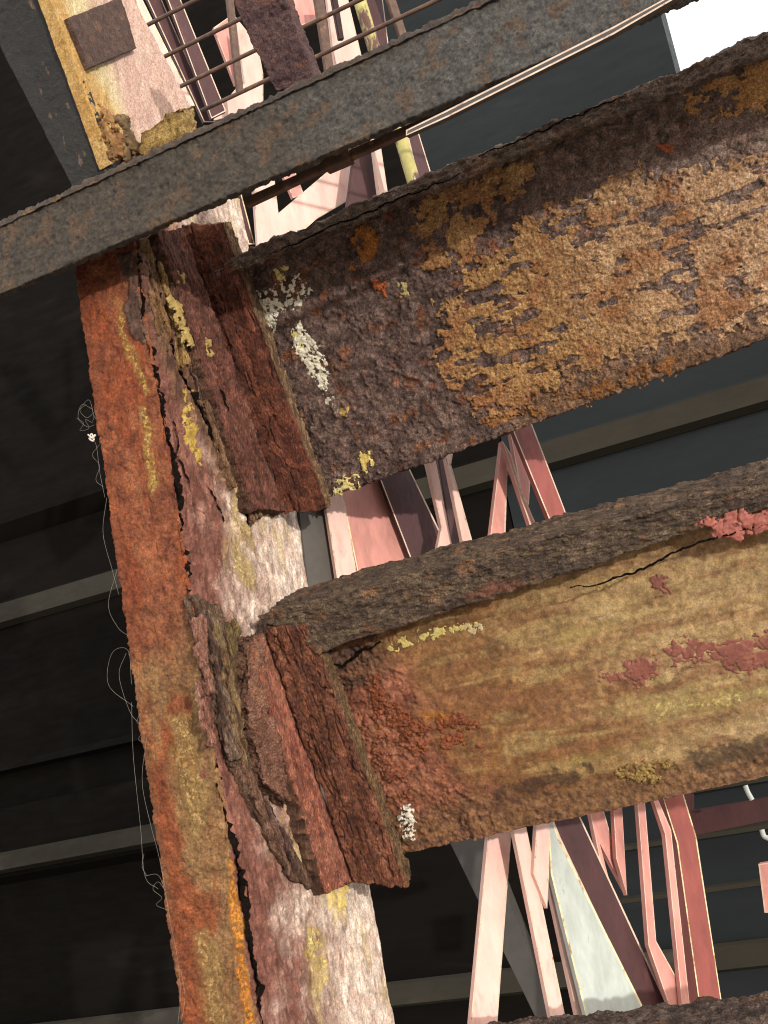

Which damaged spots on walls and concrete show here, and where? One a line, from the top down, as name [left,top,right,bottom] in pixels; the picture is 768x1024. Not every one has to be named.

rust [682,60,768,123]
rust [119,304,158,494]
rust [135,239,238,491]
crack [137,252,252,611]
rust [348,224,388,297]
rust [407,146,768,429]
crack [570,524,767,588]
crack [333,641,381,668]
rust [168,593,313,890]
rust [355,668,485,807]
rust [615,758,677,787]
rust [229,859,255,1024]